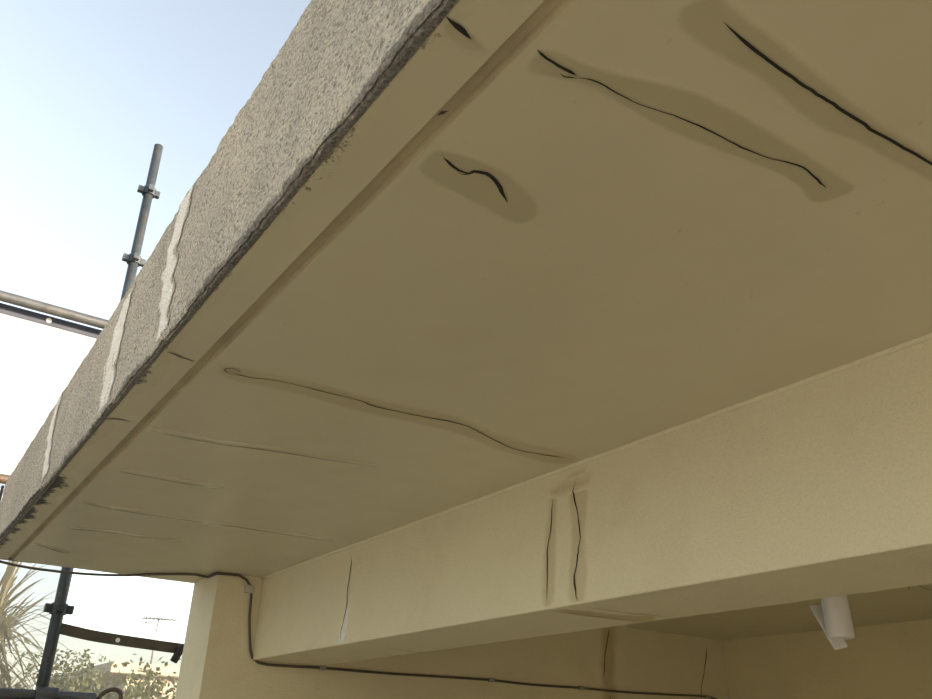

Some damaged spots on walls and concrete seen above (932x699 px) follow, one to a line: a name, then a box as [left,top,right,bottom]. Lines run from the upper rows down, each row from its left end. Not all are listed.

leakage [0,0,484,553]
crack [442,17,502,63]
crack [407,141,551,230]
crack [512,0,932,210]
crack [168,352,681,699]